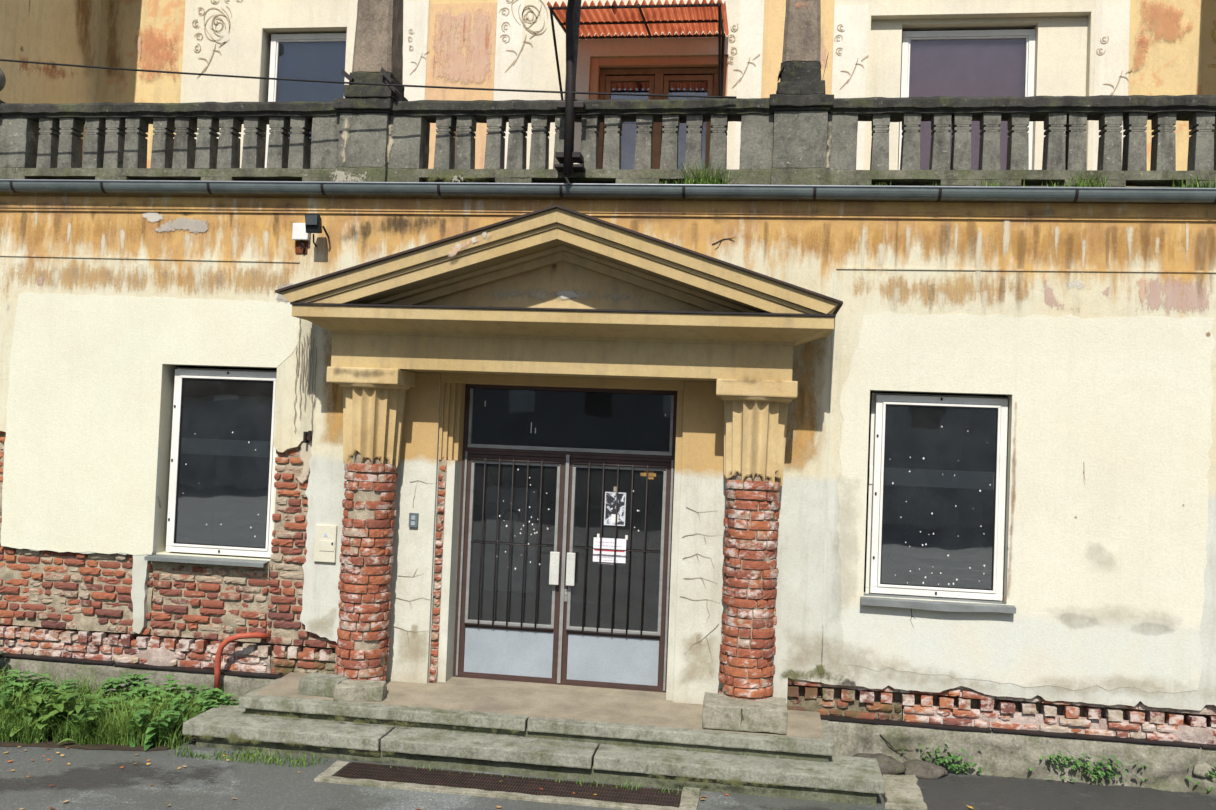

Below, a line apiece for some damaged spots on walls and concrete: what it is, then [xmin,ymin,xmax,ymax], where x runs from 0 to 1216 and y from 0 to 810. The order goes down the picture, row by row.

peeling [137,29,175,79]
peeling [67,223,105,259]
water stain [25,262,284,290]
water stain [887,278,1001,309]
peeling [1137,278,1209,313]
flaking render [0,431,398,681]
crack [680,507,719,664]
flaking render [718,480,1216,744]